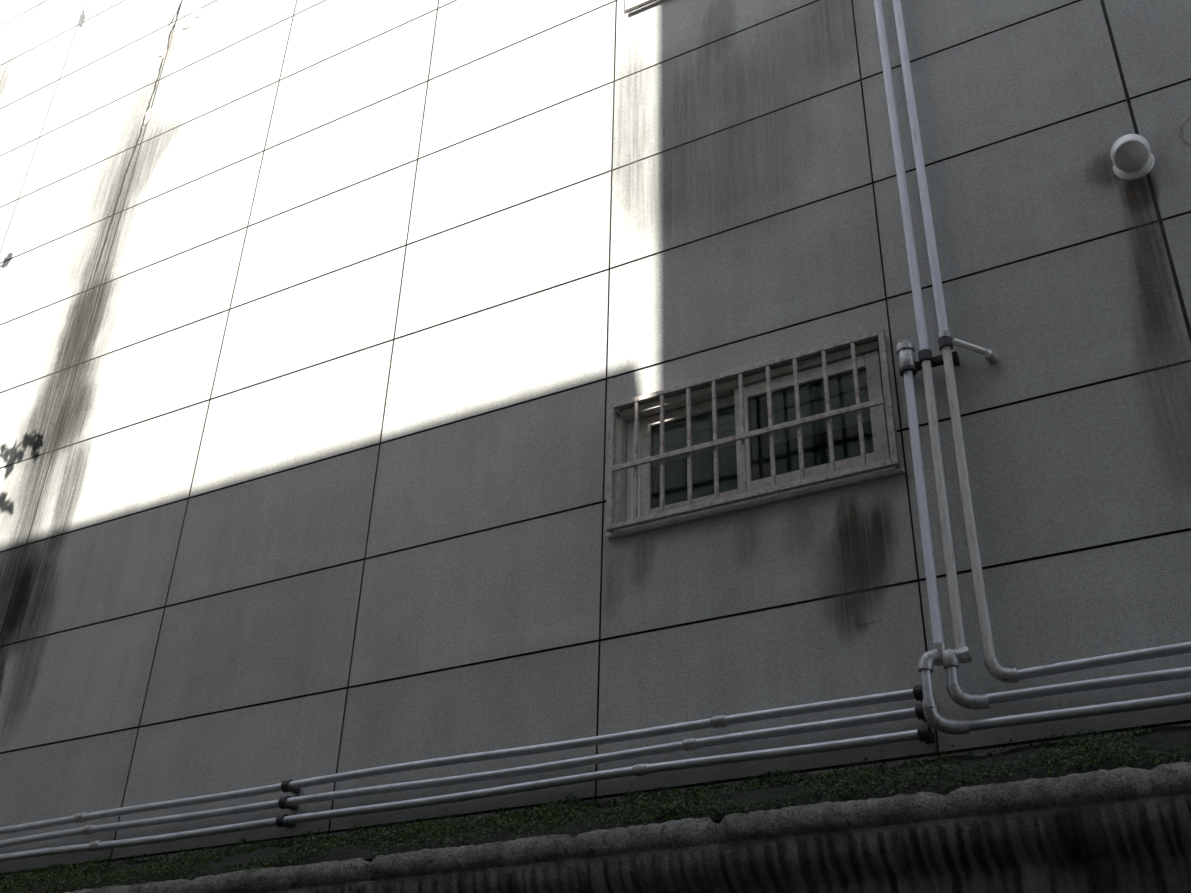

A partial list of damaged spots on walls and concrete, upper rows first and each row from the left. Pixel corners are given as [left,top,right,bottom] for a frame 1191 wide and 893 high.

damp [0,565,49,687]
damp [799,799,1191,893]